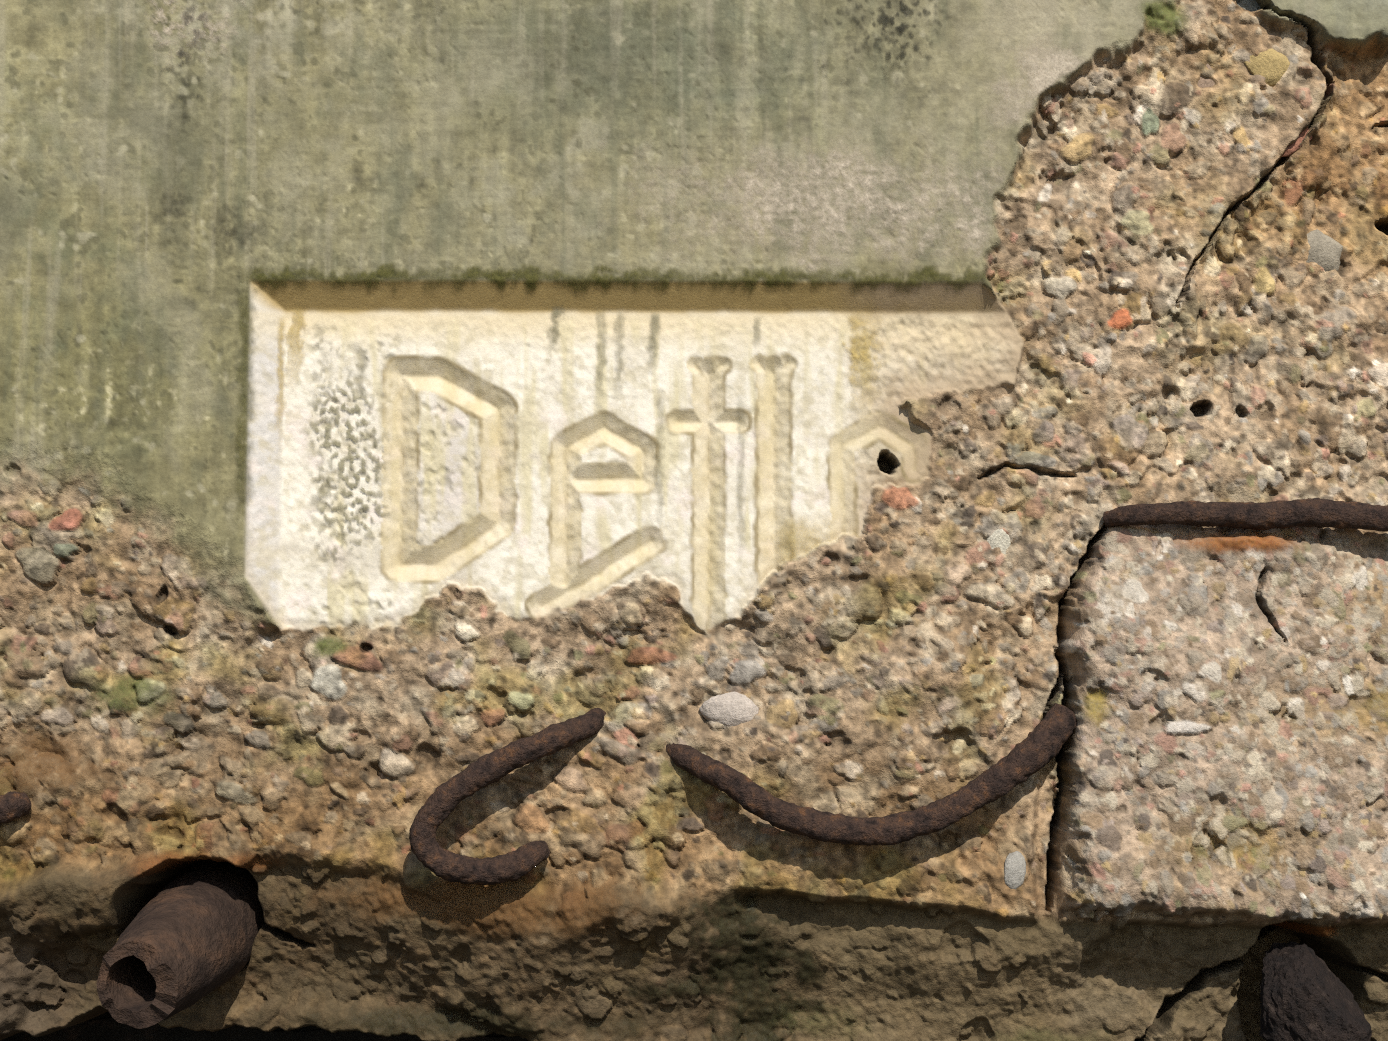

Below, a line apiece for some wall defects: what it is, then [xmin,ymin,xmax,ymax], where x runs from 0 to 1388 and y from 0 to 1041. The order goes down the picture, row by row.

crack [1176,0,1335,308]
crack [1374,120,1388,128]
spalling [948,0,1388,576]
corrosion [1190,533,1287,551]
crack [1255,569,1287,642]
spalling [0,392,1307,1041]
crack [1041,523,1109,911]
crack [1134,925,1388,1041]
spalling [1283,919,1388,1041]